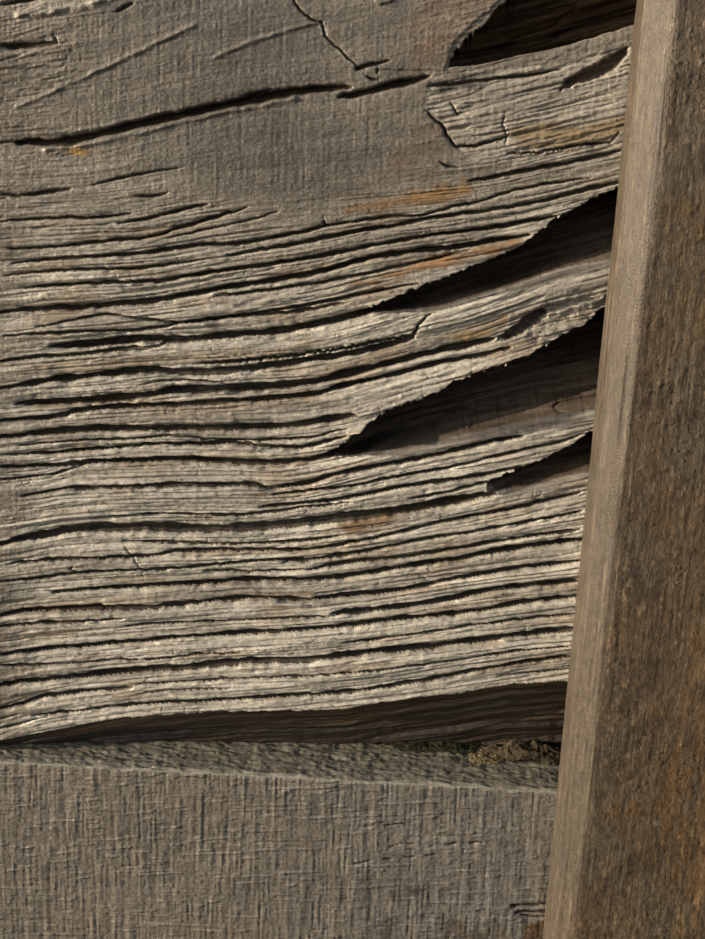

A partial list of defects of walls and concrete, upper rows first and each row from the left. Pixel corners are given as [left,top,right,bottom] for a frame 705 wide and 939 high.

crack [0,0,622,728]